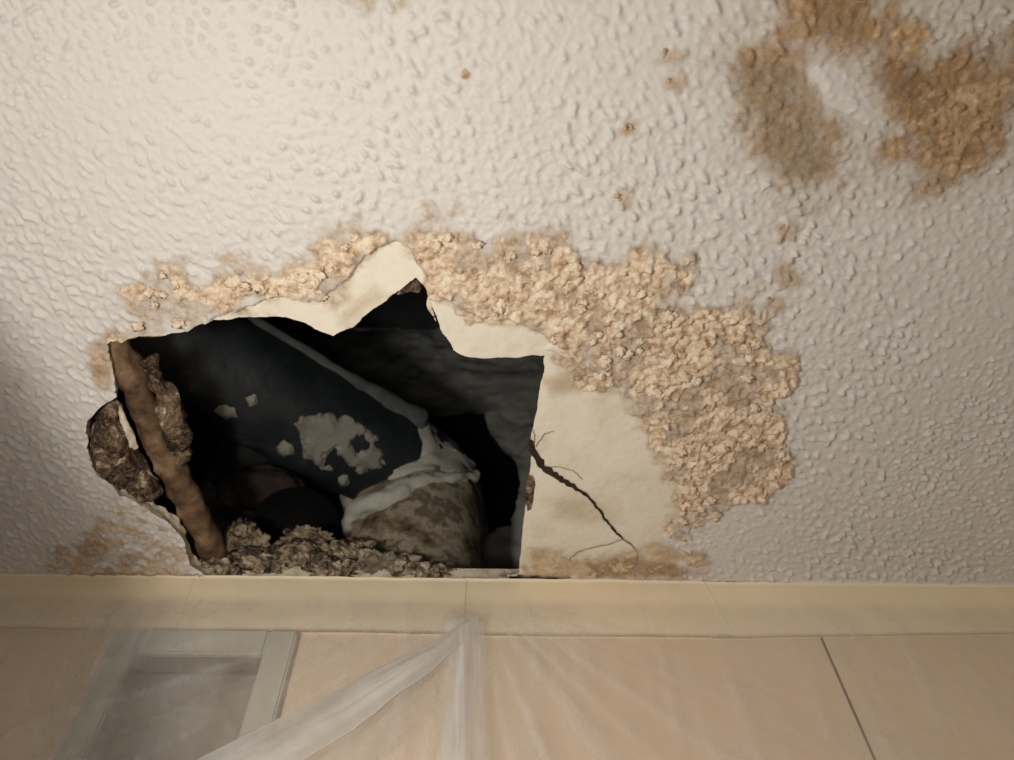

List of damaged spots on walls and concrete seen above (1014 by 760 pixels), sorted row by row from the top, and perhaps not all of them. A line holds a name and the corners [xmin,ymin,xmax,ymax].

leakage [739,0,1014,196]
spalling [86,241,686,579]
crack [517,430,638,578]